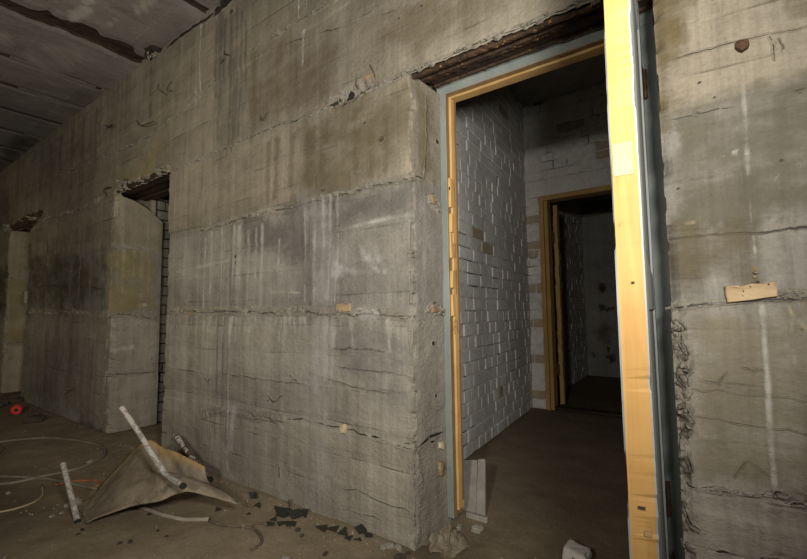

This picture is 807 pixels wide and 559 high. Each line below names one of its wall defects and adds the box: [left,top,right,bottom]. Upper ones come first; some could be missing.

spalling [326,77,376,109]
spalling [114,165,173,194]
damp [247,205,335,259]
crack [203,346,444,453]
spalling [669,305,701,559]
crack [691,365,807,403]
crack [693,414,807,436]
damp [759,305,772,424]